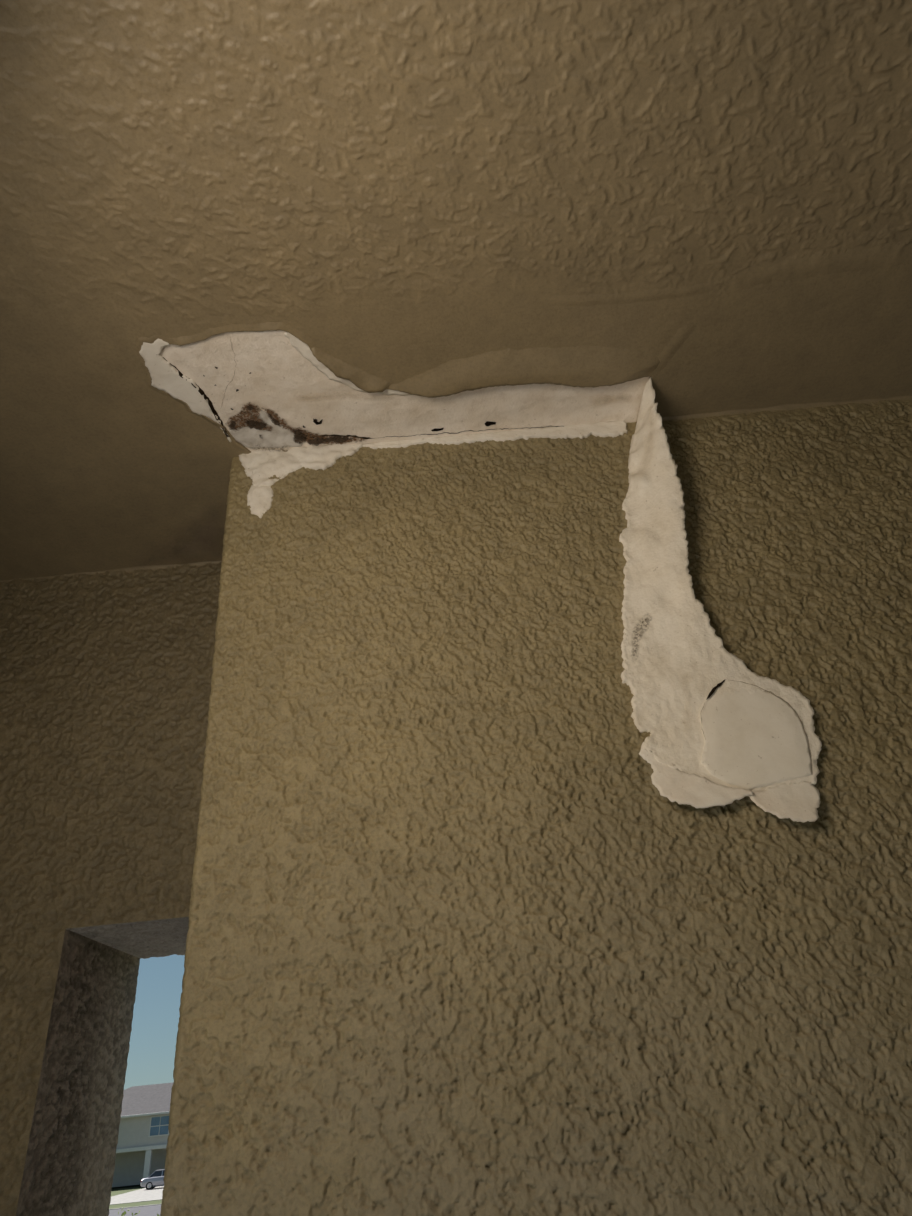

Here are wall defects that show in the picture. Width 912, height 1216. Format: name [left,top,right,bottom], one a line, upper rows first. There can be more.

peeling [135,322,822,823]